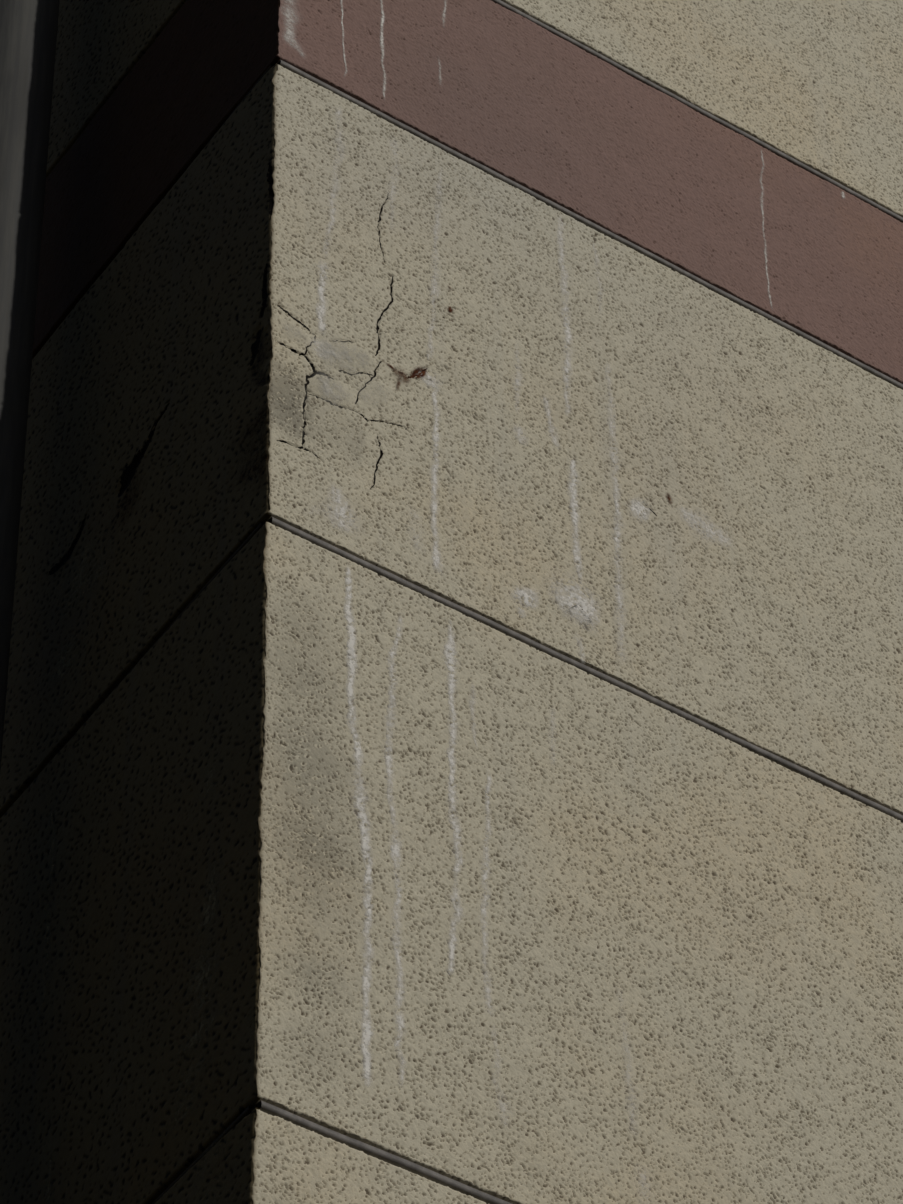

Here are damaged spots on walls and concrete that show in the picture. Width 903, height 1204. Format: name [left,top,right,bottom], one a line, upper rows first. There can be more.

crack [266,162,274,219]
crack [250,193,404,489]
leakage [345,567,373,1085]
leakage [385,619,405,1080]
leakage [444,626,462,873]